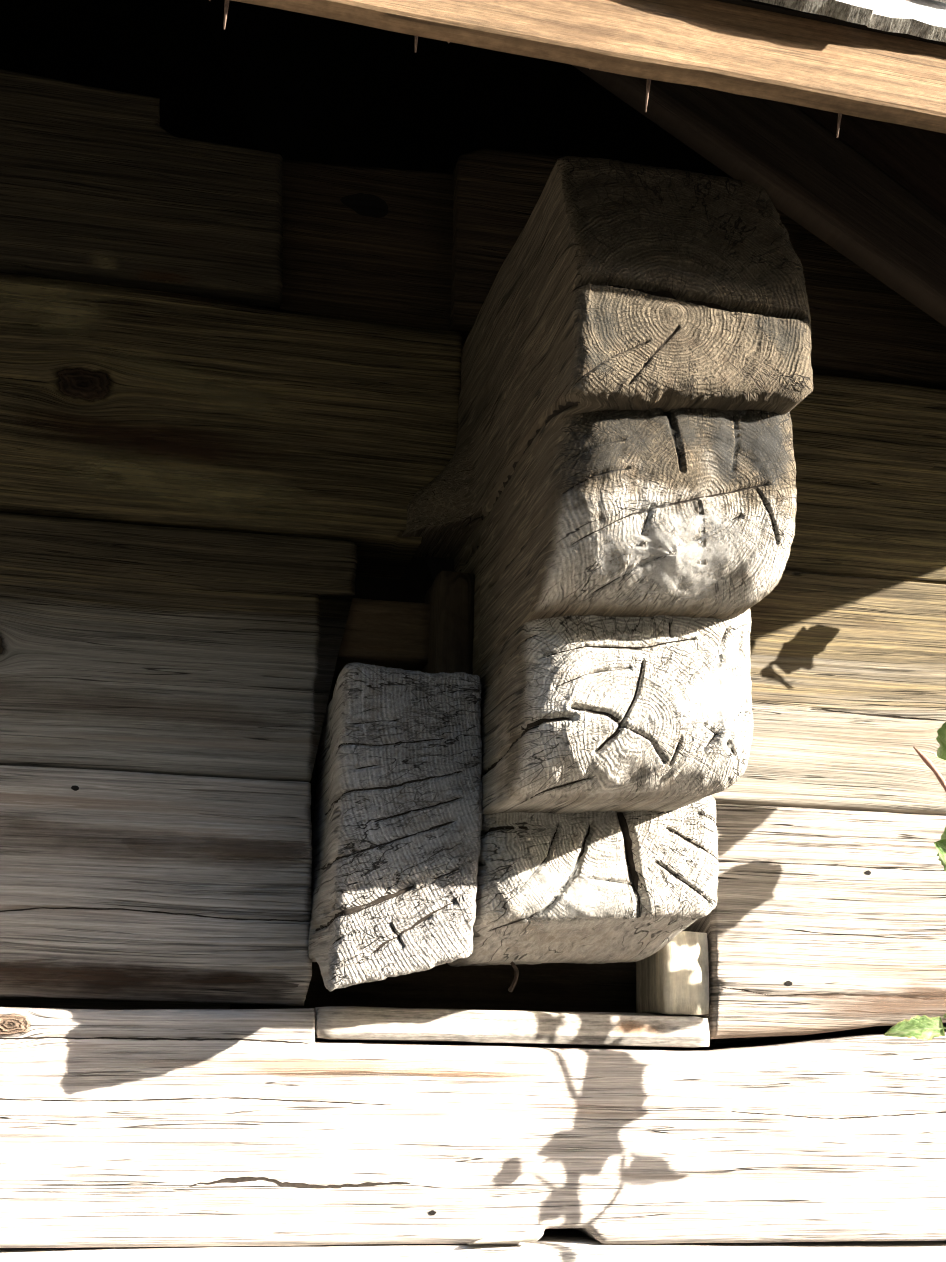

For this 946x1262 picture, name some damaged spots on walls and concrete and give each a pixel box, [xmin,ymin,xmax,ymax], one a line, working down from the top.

crack [488,284,771,515]
crack [572,436,777,593]
crack [323,622,745,931]
crack [667,813,944,871]
crack [817,709,946,721]
crack [191,1177,410,1188]